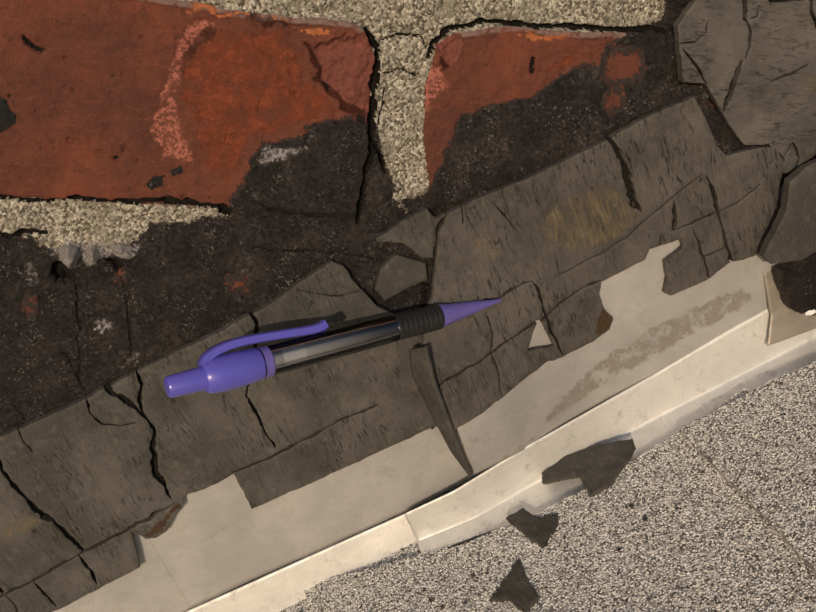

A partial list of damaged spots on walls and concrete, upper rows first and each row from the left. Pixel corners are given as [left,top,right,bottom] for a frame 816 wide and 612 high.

crack [355,17,667,224]
crack [0,228,48,239]
spalling [51,260,73,280]
spalling [104,257,124,270]
crack [0,194,232,215]
peeling [374,207,435,300]
crack [532,281,561,352]
rust [596,308,613,334]
crack [59,269,169,493]
crack [246,385,275,445]
crack [0,459,103,579]
rust [145,504,180,537]